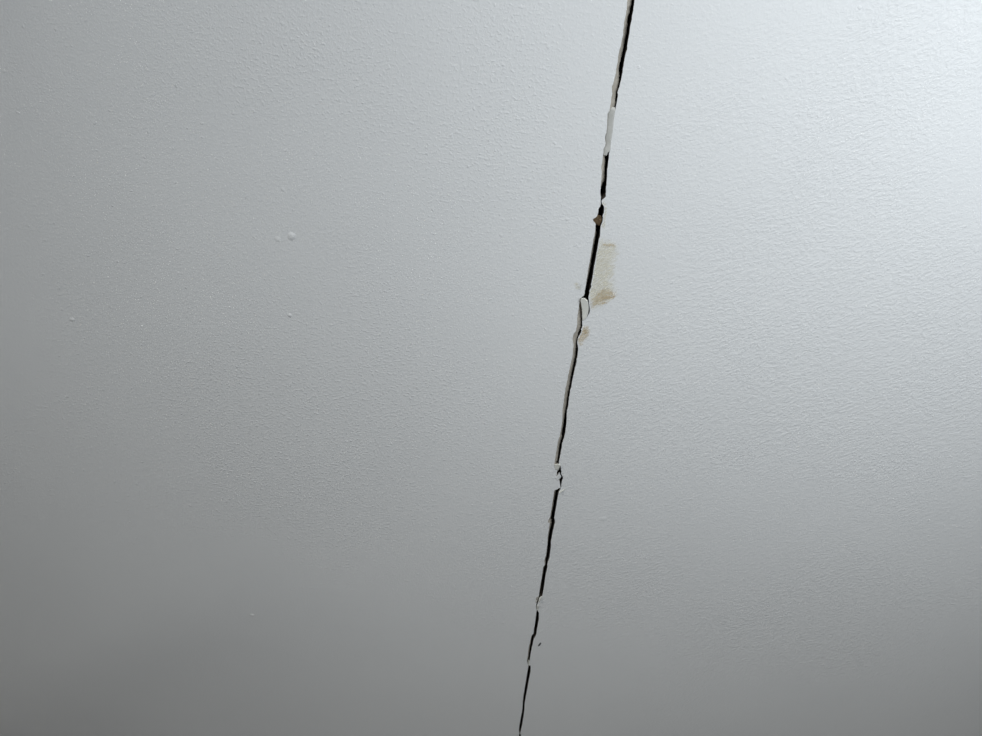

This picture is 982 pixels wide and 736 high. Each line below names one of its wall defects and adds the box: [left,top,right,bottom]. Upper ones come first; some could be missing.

crack [519,0,634,736]